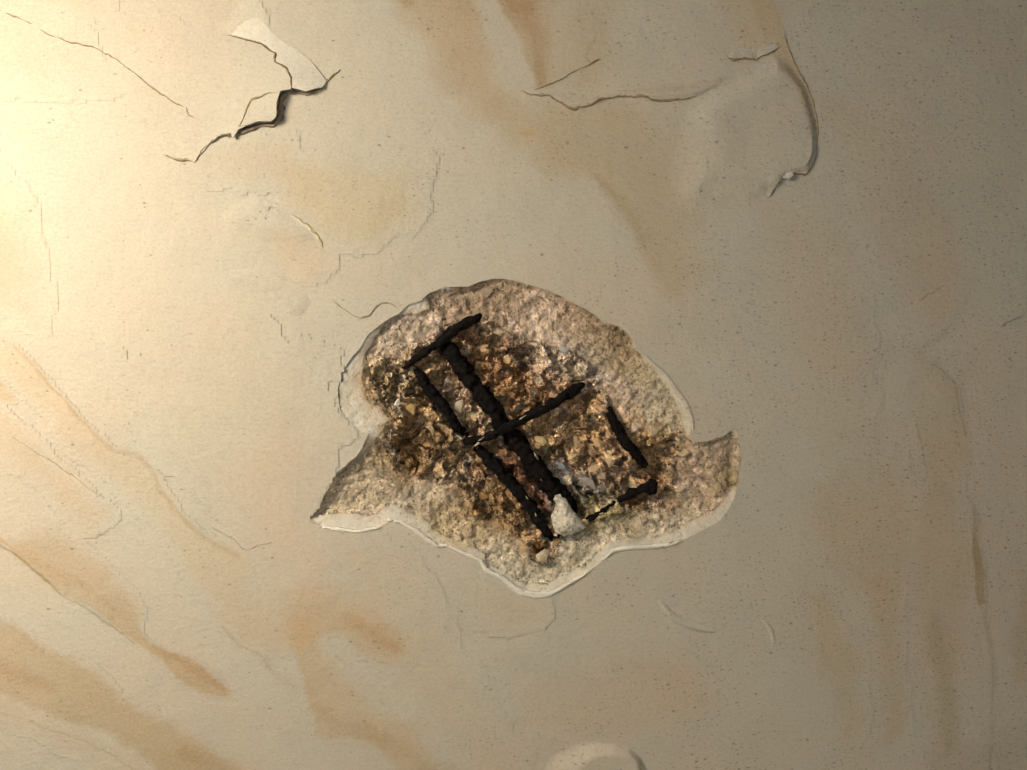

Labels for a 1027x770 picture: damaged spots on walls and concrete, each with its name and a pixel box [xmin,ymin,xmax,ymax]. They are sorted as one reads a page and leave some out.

peeling [117,17,326,163]
crack [165,35,292,162]
crack [521,59,694,111]
crack [726,35,819,198]
water stain [182,129,440,286]
water stain [0,162,729,770]
corrosion [390,432,500,520]
corrosion [467,351,545,413]
corrosion [491,442,551,513]
spalling [310,279,741,599]
corrosion [614,474,671,513]
water stain [387,0,1027,770]